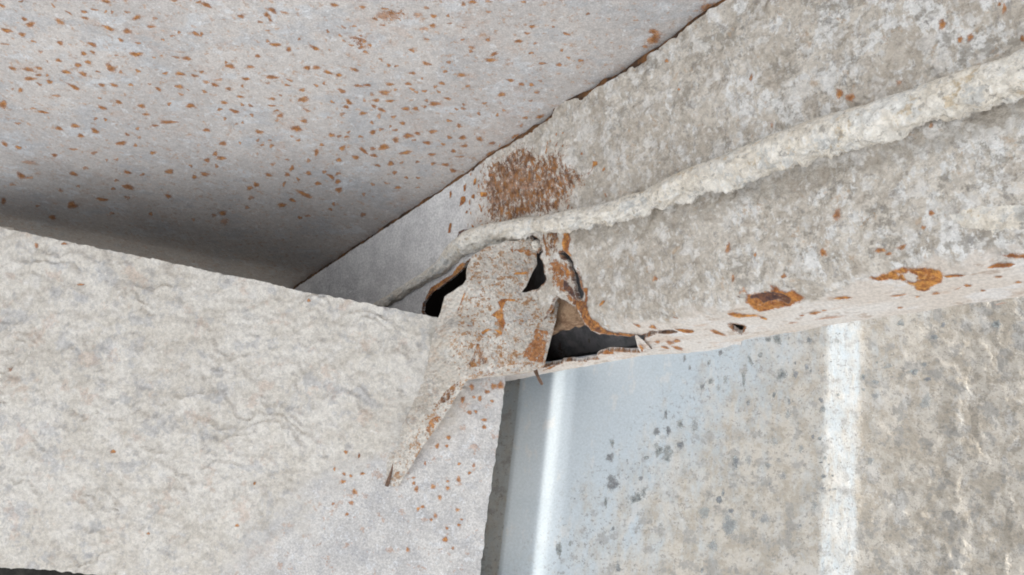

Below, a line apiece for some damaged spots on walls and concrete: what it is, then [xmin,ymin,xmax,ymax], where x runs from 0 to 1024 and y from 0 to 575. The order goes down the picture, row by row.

rust [515,25,584,66]
rust [245,49,605,227]
peeling [426,263,464,299]
rust [728,274,837,324]
rust [871,267,986,309]
rust [426,381,504,432]